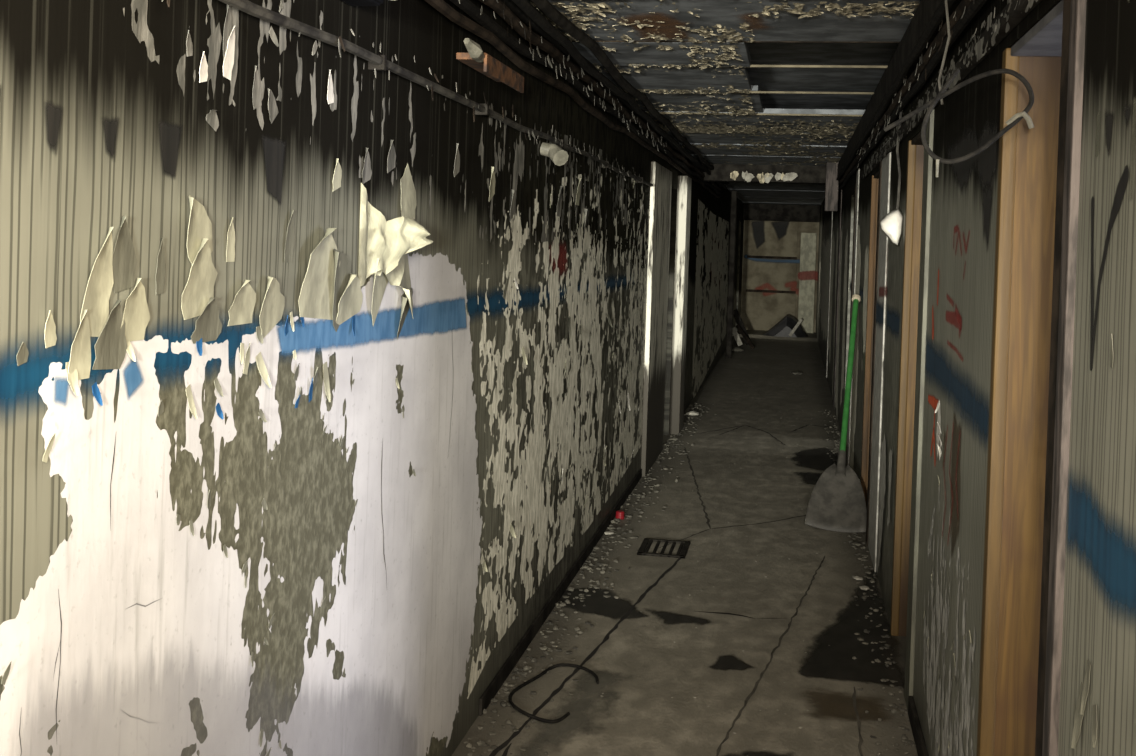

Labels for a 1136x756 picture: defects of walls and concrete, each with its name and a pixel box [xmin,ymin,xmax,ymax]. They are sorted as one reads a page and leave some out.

peeling [123,0,160,64]
peeling [176,0,239,131]
peeling [253,0,337,144]
peeling [530,0,920,183]
water stain [1096,99,1136,199]
peeling [0,55,650,756]
crack [489,425,834,756]
water stain [799,571,905,687]
water stain [809,692,886,720]
crack [852,687,863,756]